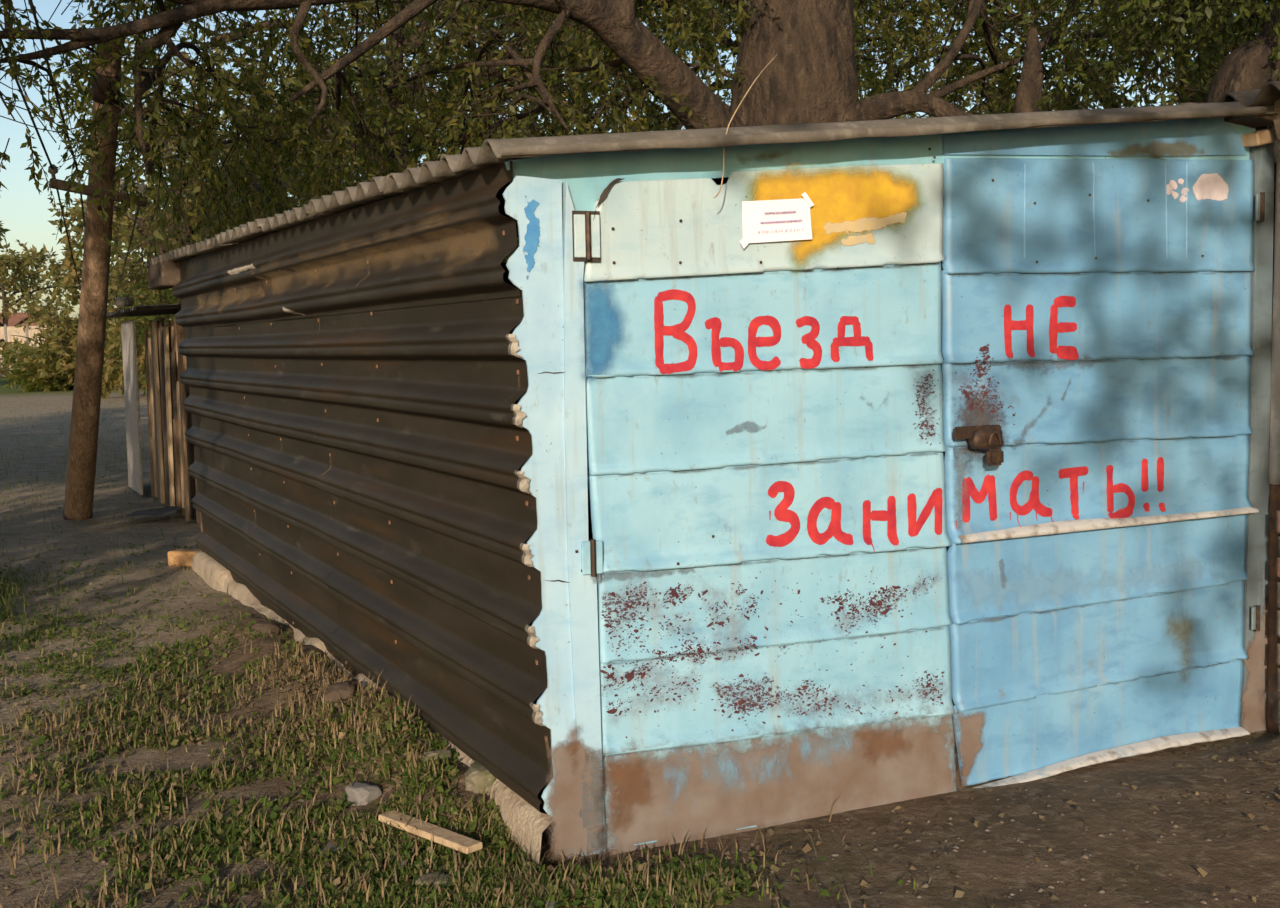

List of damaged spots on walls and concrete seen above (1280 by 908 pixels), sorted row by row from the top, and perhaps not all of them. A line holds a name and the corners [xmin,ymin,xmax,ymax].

corrosion [912,370,941,446]
corrosion [955,342,1016,425]
corrosion [544,576,984,859]